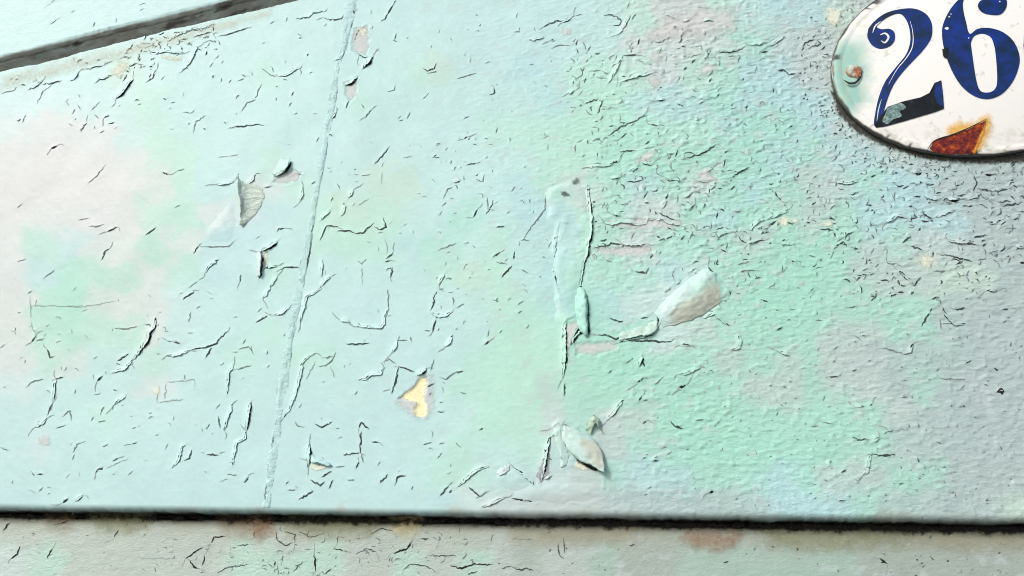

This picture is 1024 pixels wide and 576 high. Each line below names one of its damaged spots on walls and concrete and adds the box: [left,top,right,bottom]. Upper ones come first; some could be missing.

peeling [272,158,299,182]
peeling [237,175,264,226]
crack [516,1,1024,507]
crack [1,0,635,576]
peeling [400,377,434,417]
peeling [551,415,605,473]
crack [847,534,1007,576]